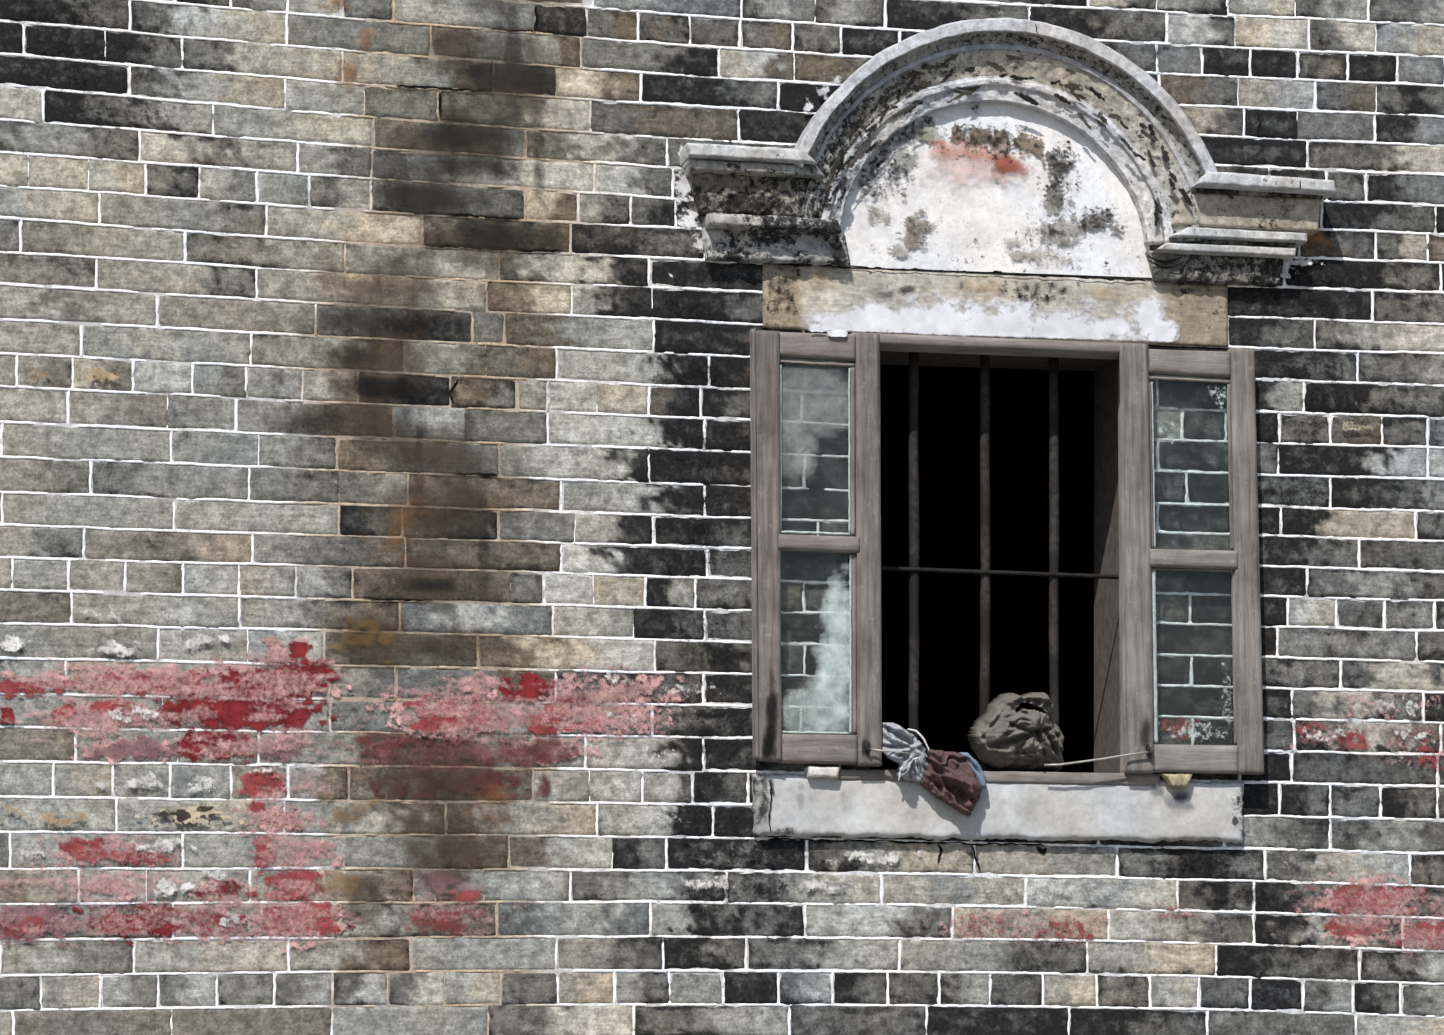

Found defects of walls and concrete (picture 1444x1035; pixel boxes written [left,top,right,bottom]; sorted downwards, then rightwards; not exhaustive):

leakage [384,114,511,212]
leakage [850,104,1123,266]
peeling [824,54,1193,226]
leakage [1236,169,1314,177]
flaking render [1079,206,1125,235]
leakage [1003,280,1079,305]
leakage [298,261,487,535]
leakage [652,340,744,399]
leakage [656,508,736,573]
leakage [398,555,455,599]
leakage [640,684,727,761]
spalling [135,804,246,825]